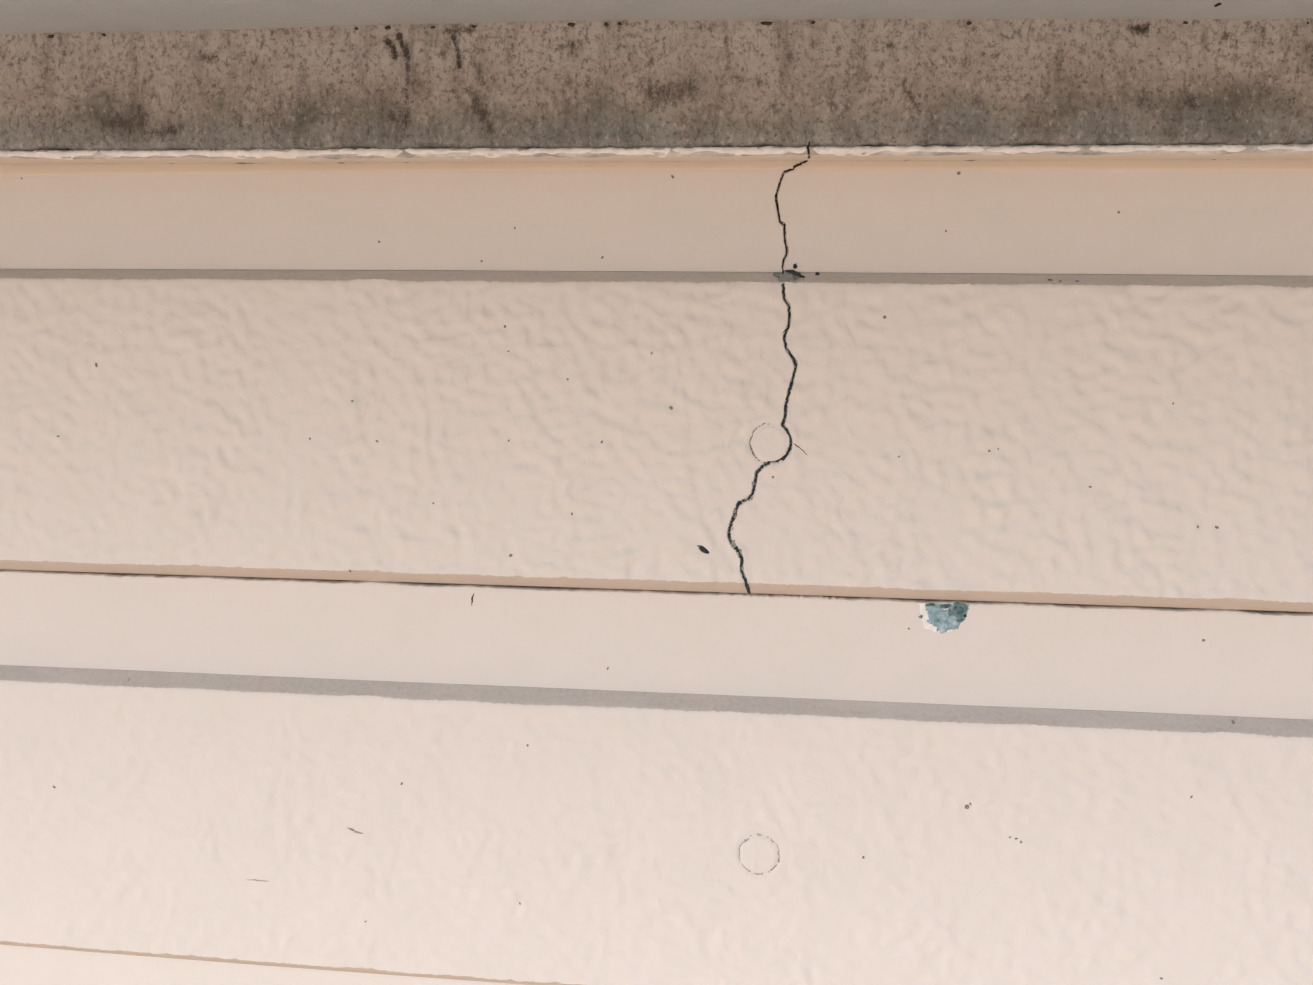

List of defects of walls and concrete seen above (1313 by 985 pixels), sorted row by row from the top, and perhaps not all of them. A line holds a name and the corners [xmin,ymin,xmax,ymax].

crack [727,142,810,594]
peeling [919,601,969,634]